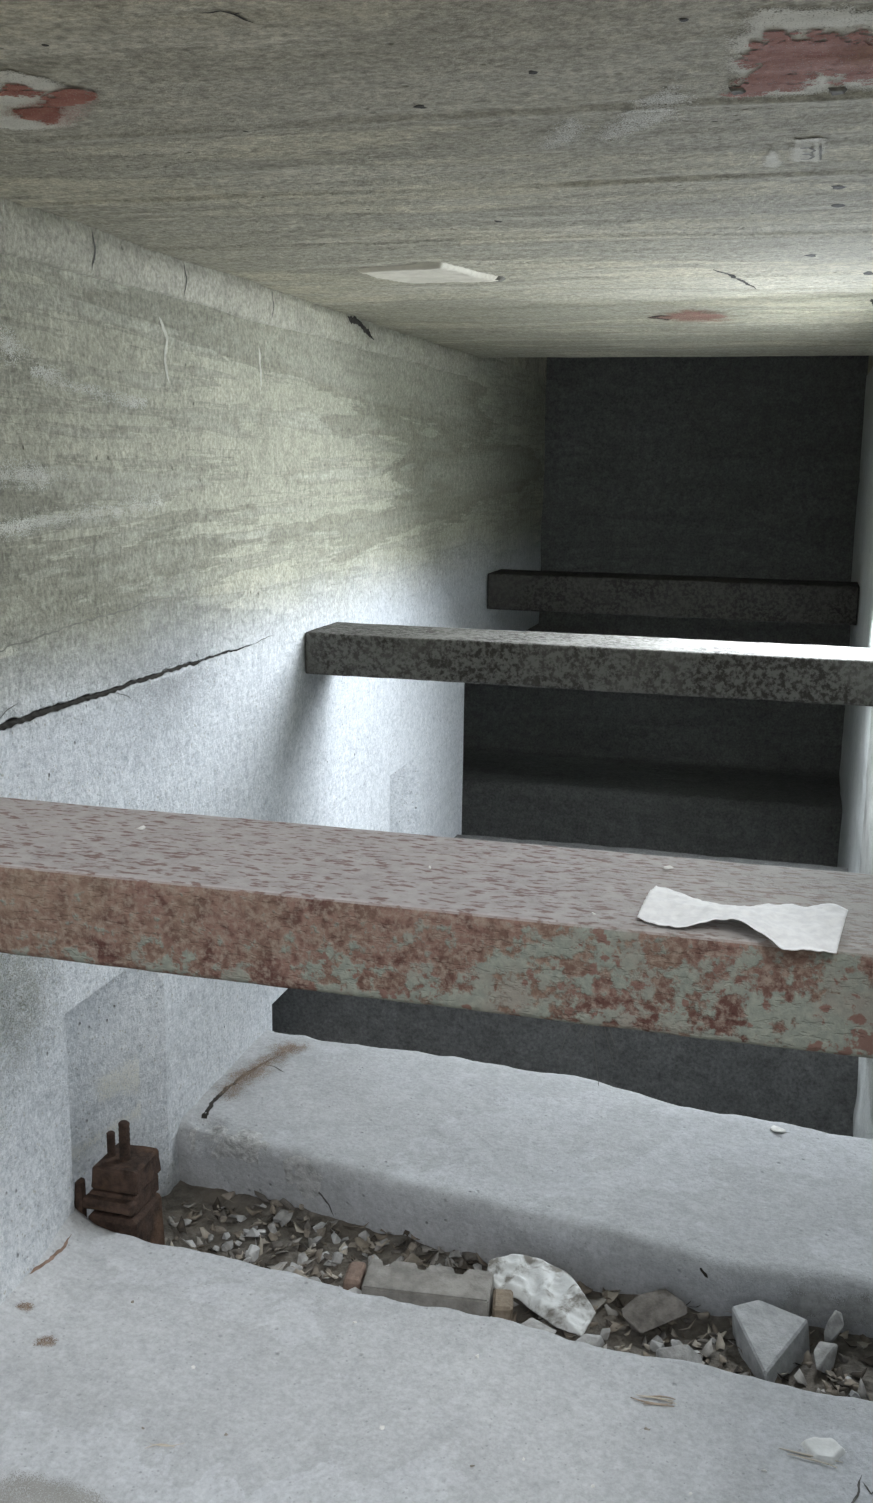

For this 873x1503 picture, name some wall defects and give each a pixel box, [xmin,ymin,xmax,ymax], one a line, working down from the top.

peeling [714,3,873,100]
peeling [0,70,85,132]
crack [0,635,272,731]
crack [201,1037,309,1119]